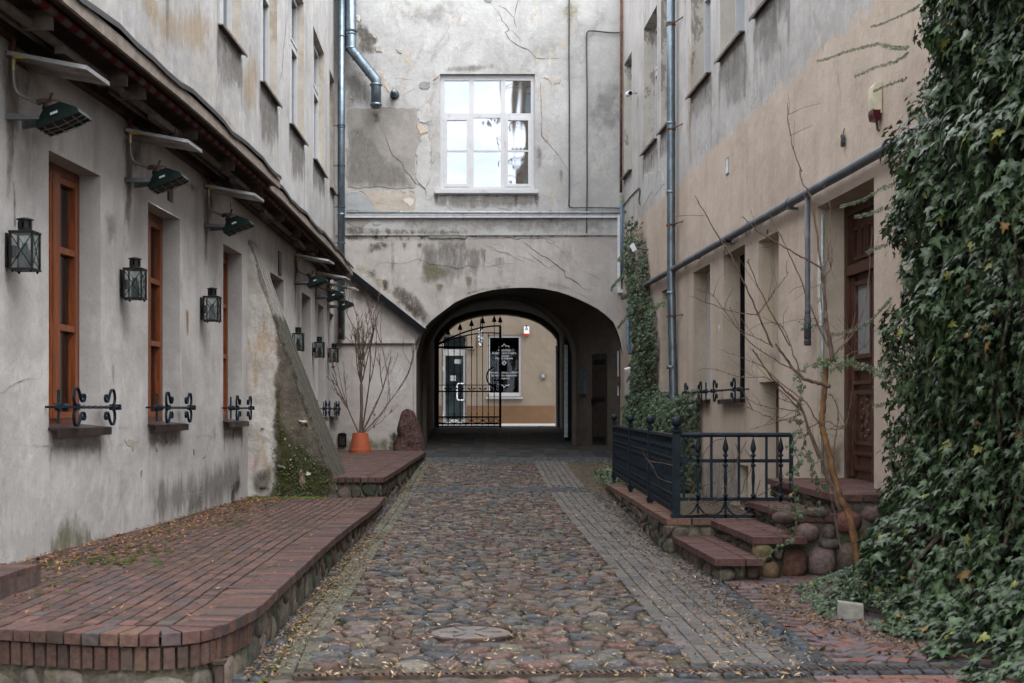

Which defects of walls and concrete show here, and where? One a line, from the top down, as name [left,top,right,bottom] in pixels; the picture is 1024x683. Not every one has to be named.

crack [492,2,574,172]
peeling [362,103,431,225]
mould [372,271,427,322]
leakage [347,227,483,289]
crack [379,130,599,303]